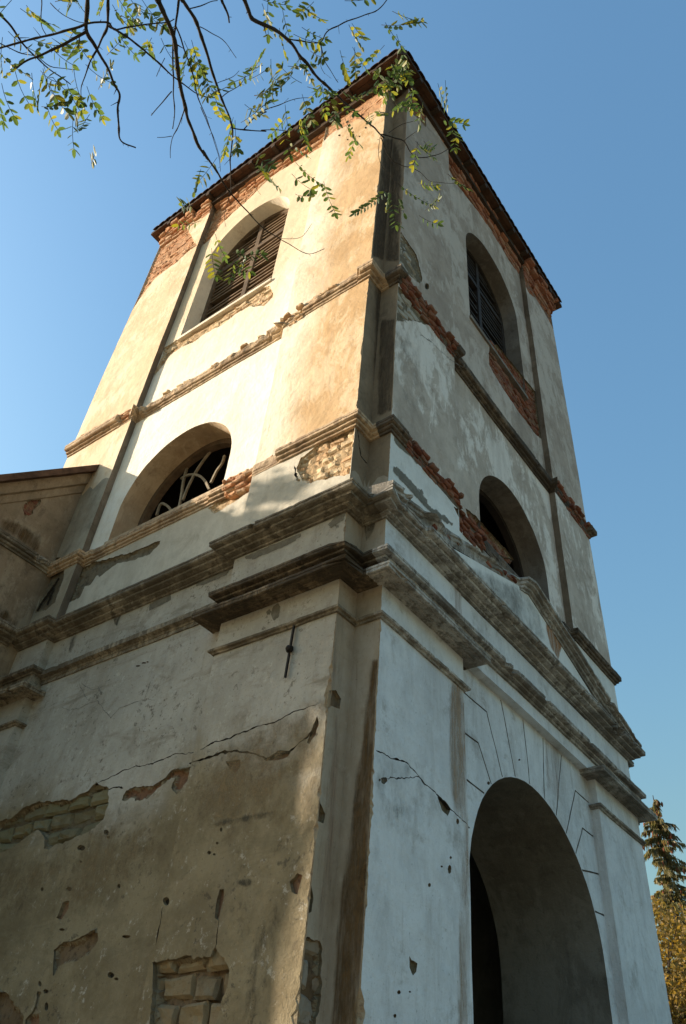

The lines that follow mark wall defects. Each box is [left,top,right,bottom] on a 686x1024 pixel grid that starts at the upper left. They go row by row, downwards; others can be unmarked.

spalling [396,286,426,325]
spalling [488,340,541,438]
spalling [296,428,355,483]
spalling [454,507,518,584]
spalling [0,782,110,863]
spalling [122,766,190,801]
crack [95,704,318,790]
water stain [333,660,378,1024]
crack [376,750,470,828]
spalling [53,887,98,976]
flaking render [155,950,229,1024]
spalling [293,937,322,1024]